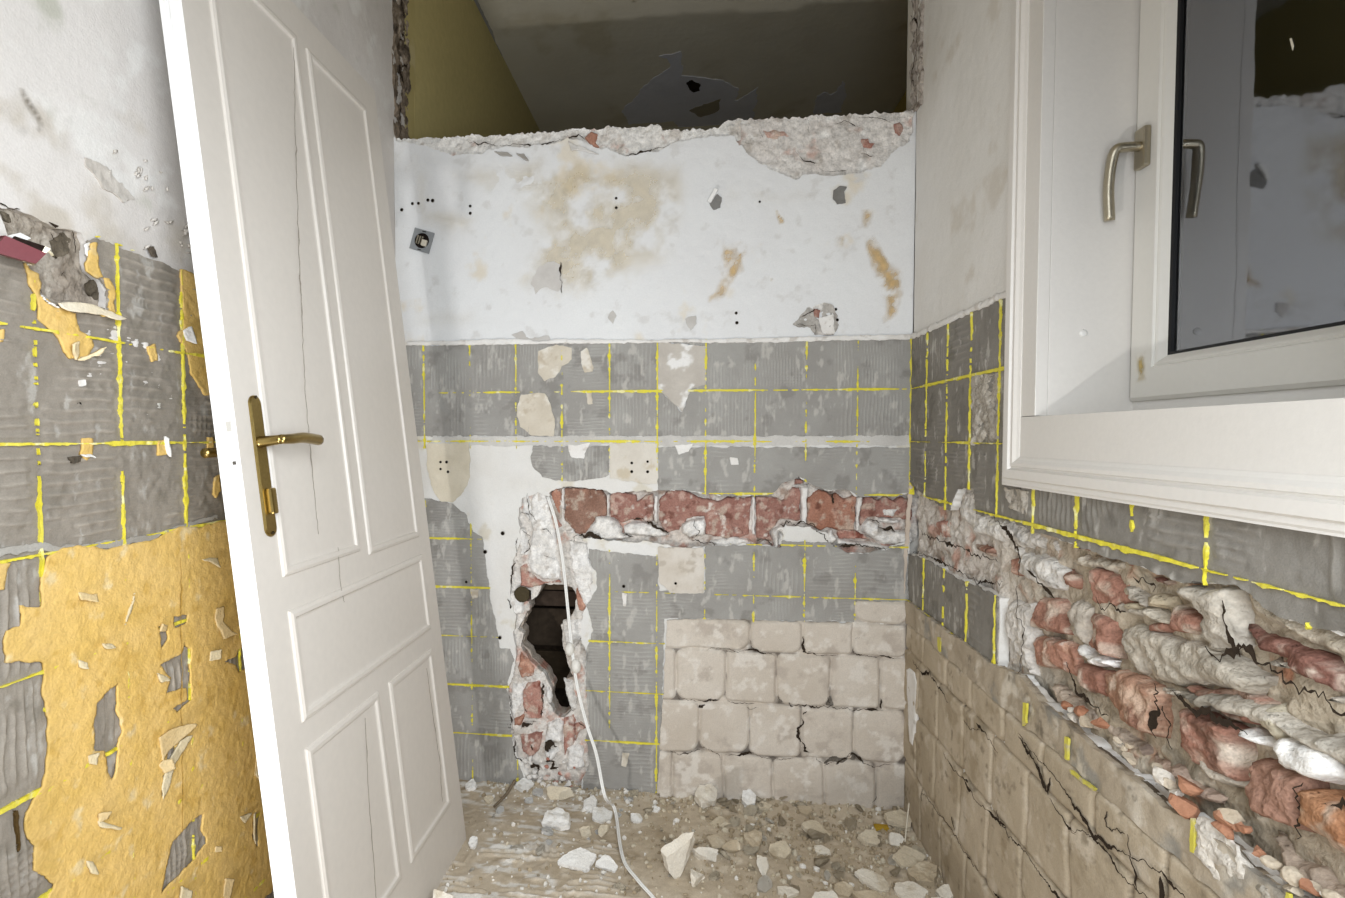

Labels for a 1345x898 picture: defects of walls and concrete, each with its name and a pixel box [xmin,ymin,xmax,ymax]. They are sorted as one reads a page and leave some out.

flaking render [392,0,925,180]
flaking render [84,150,169,203]
flaking render [0,203,127,320]
peeling [72,341,107,361]
peeling [183,326,198,344]
peeling [517,344,594,436]
peeling [658,343,706,411]
peeling [163,436,172,457]
spalling [551,442,1345,898]
peeling [159,724,197,799]
crack [709,638,1185,898]
spalling [13,810,21,852]